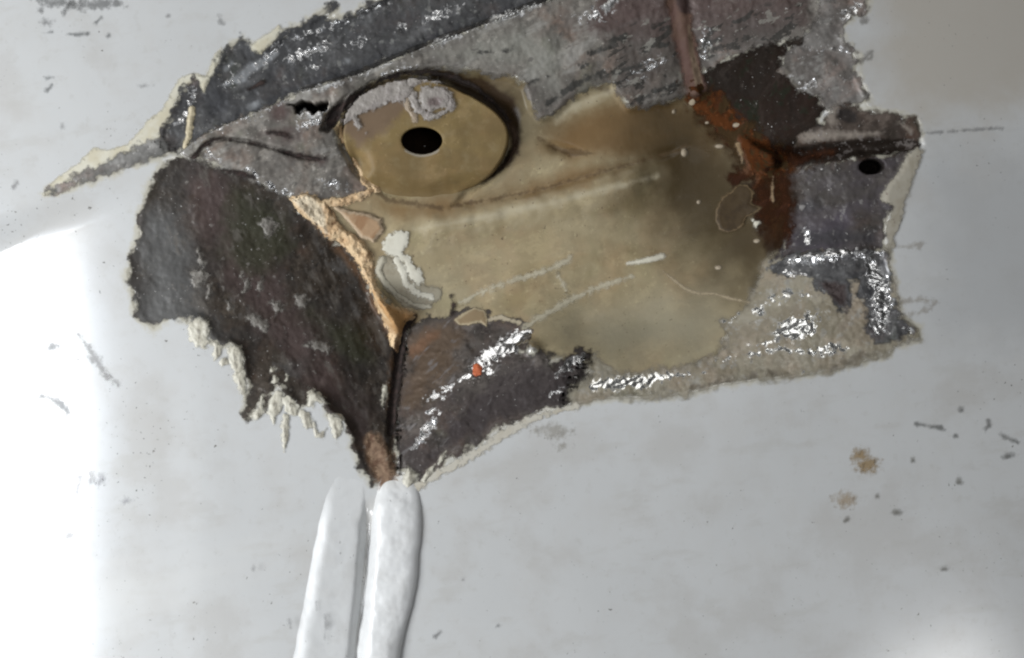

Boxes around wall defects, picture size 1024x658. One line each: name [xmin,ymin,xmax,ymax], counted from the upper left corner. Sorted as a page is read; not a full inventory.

peeling [44,0,920,491]
corrosion [666,0,836,246]